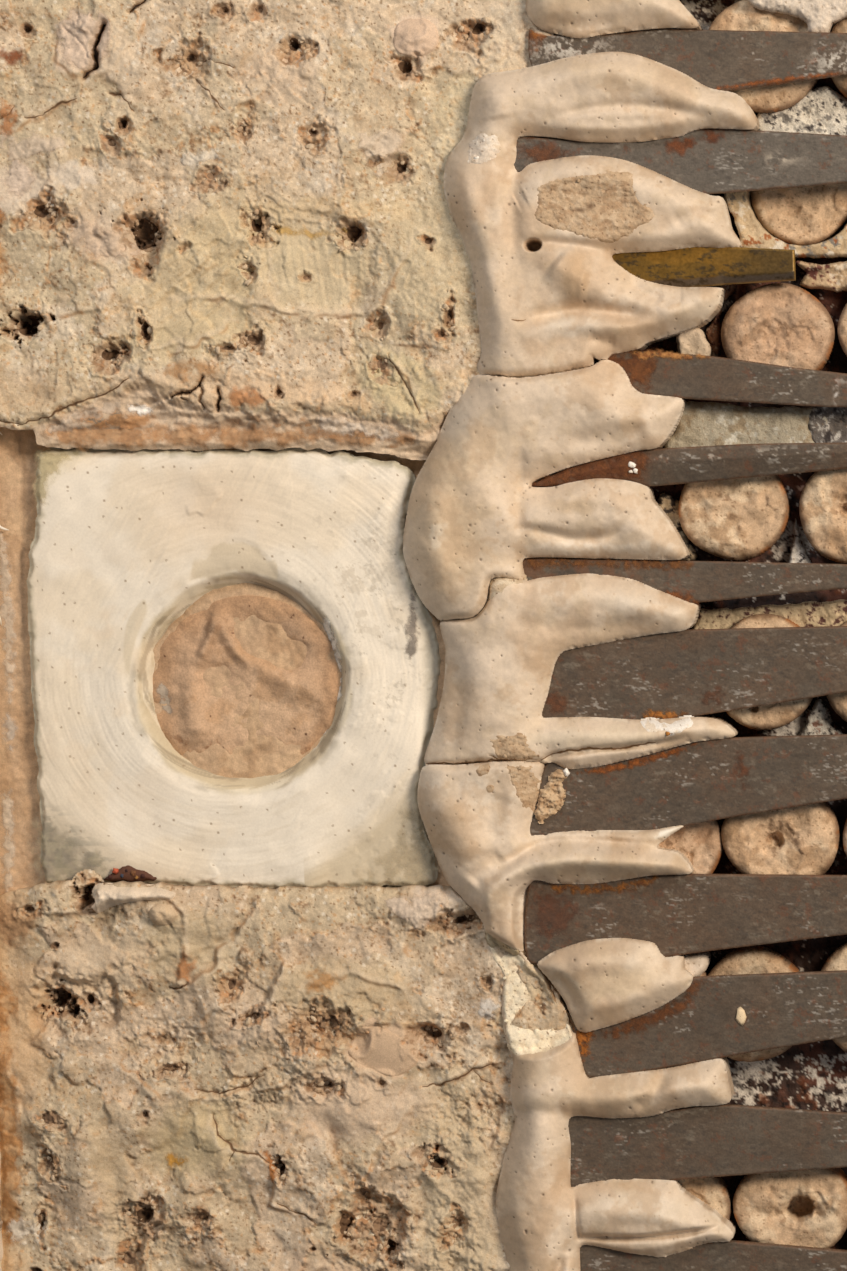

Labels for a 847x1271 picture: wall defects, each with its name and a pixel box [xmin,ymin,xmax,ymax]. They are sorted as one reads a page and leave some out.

crack [0,0,146,119]
corrosion [526,143,560,162]
spalling [534,170,654,243]
corrosion [532,451,648,486]
spalling [476,733,570,816]
corrosion [576,983,698,1055]
crack [194,1075,277,1166]
crack [277,1203,316,1224]